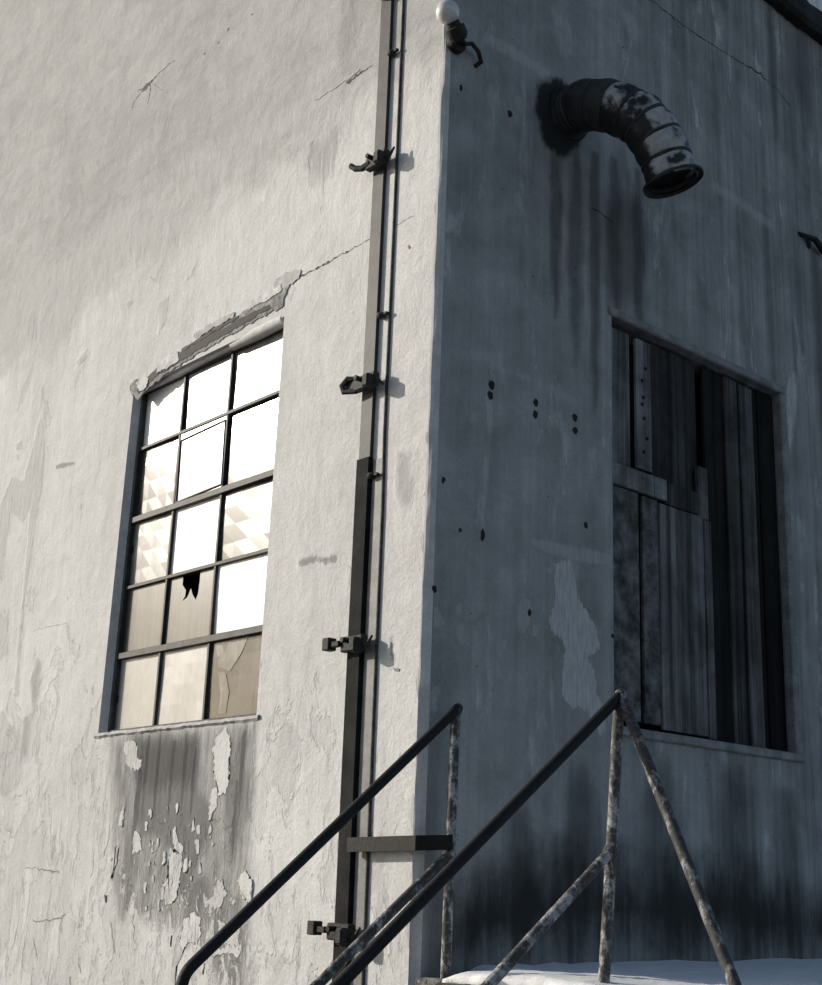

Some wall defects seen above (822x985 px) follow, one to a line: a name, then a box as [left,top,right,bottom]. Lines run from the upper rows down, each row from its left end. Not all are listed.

crack [131,13,253,108]
crack [317,65,373,100]
crack [290,239,370,285]
peeling [0,27,367,801]
peeling [110,846,119,881]
peeling [132,727,231,940]
water stain [102,705,264,962]
peeling [237,870,253,903]
peeling [168,912,205,985]
peeling [212,944,240,958]
water stain [197,910,259,985]